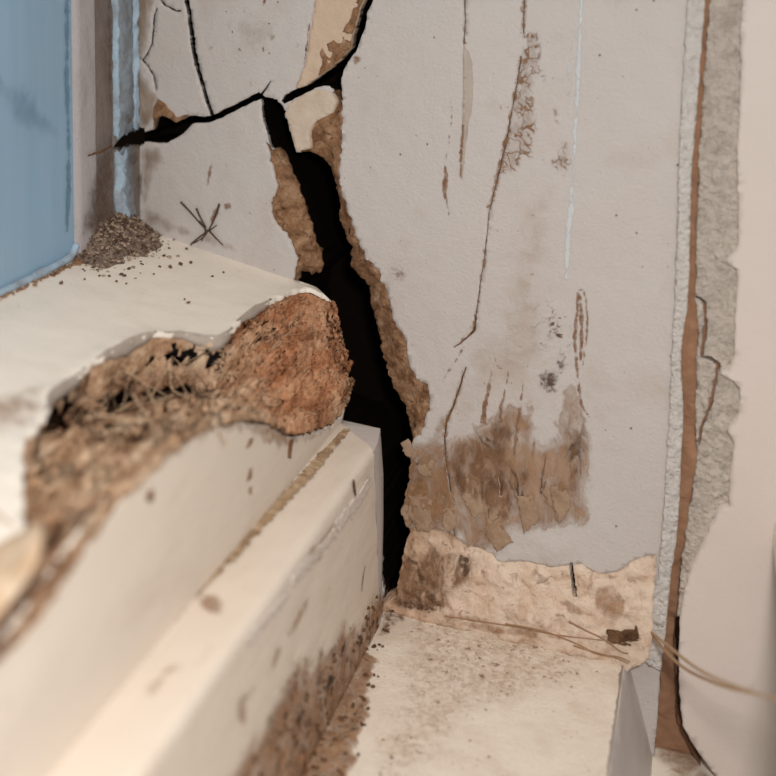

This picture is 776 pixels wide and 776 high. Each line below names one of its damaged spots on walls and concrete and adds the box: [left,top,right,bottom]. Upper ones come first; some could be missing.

corrosion [487,1,539,208]
crack [453,56,522,348]
peeling [96,298,272,361]
crack [88,0,413,597]
crack [444,367,466,490]
spalling [267,0,657,672]
corrosion [573,290,588,415]
crack [697,296,720,443]
peeling [676,0,743,617]
peeling [0,524,43,616]
damp [238,591,387,776]
damp [420,633,545,702]